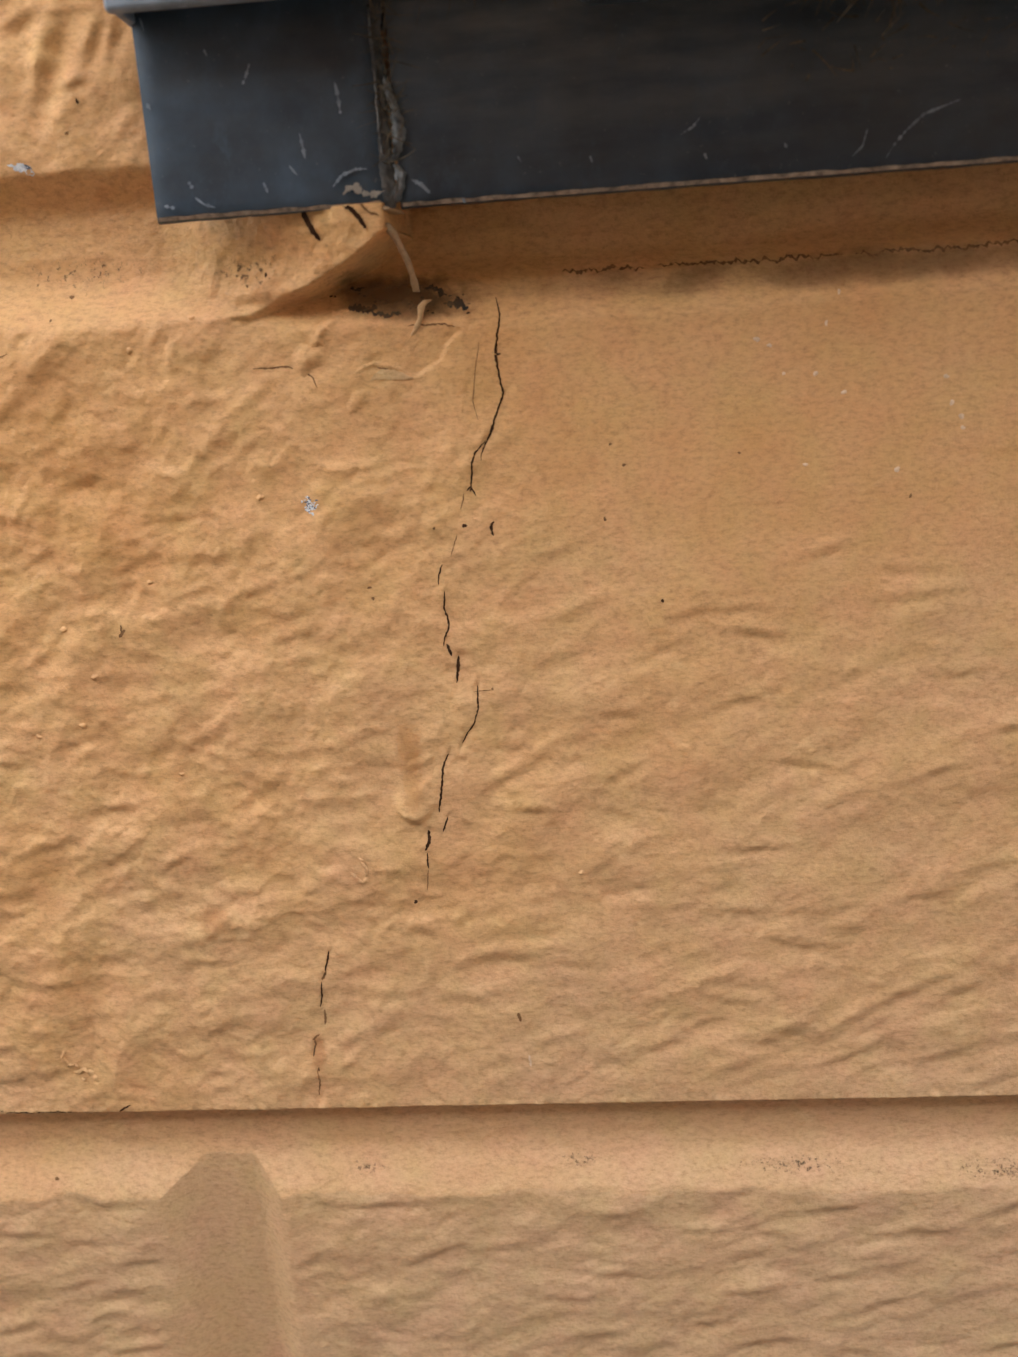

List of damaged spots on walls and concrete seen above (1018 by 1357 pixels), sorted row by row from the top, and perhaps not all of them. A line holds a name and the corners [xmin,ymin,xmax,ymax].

peeling [306,305,351,348]
peeling [346,360,413,414]
crack [423,297,504,890]
crack [311,951,329,1095]